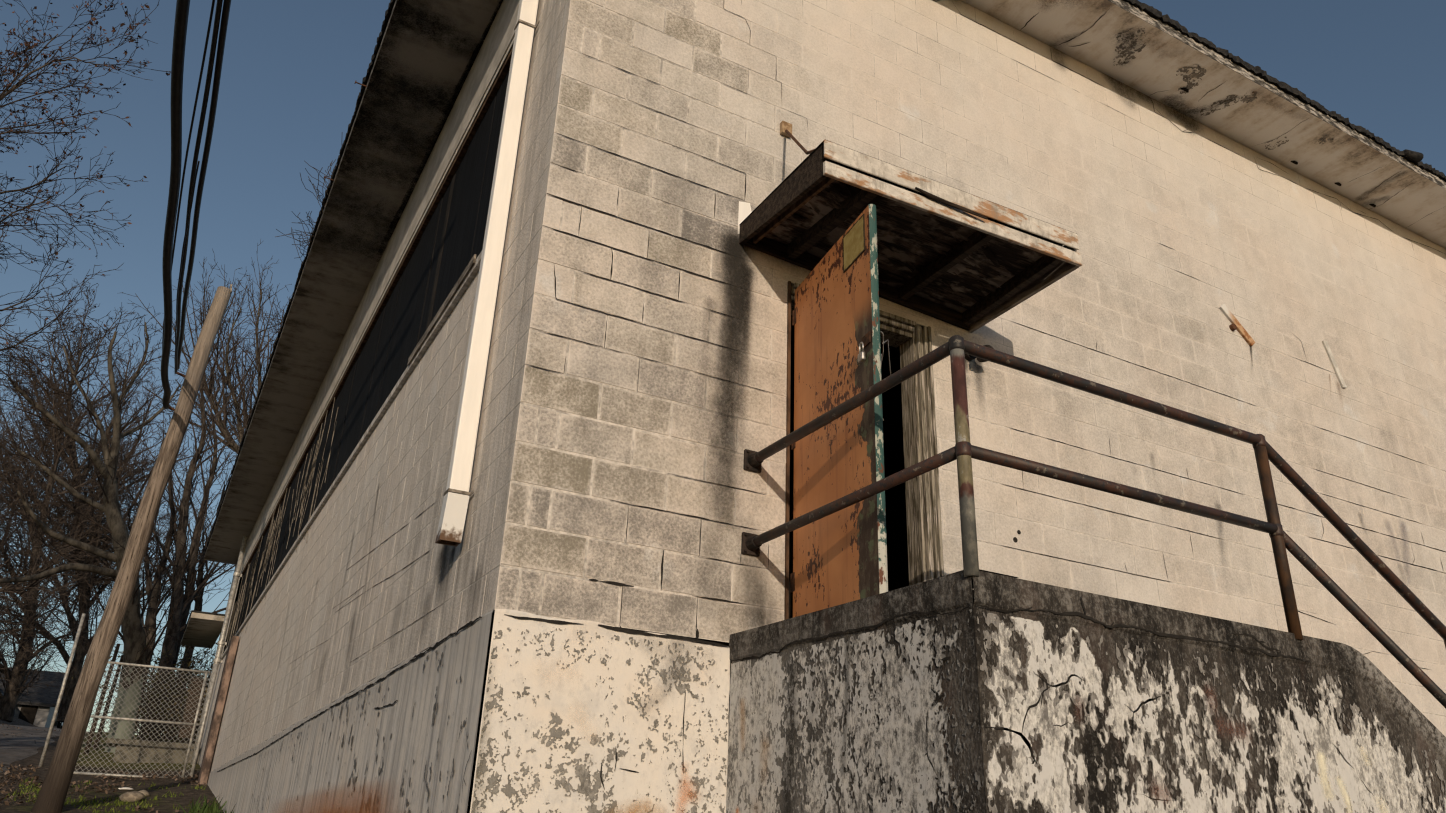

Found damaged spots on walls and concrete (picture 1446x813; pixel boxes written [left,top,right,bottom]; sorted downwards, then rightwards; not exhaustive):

crack [723,1,808,125]
leakage [315,0,503,257]
leakage [719,234,751,485]
crack [1012,428,1241,494]
crack [1279,469,1446,573]
crack [217,471,1305,780]
crack [600,751,639,790]